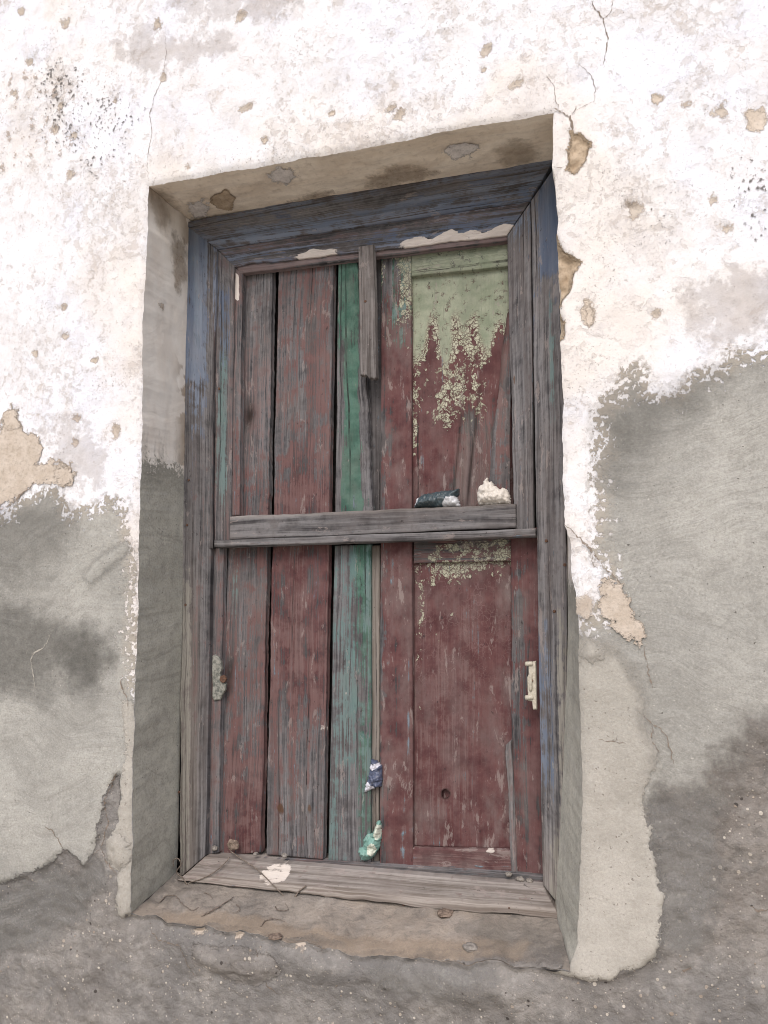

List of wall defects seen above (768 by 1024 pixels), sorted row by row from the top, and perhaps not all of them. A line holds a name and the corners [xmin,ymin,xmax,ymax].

crack [548,2,613,130]
flaking render [210,189,236,211]
spalling [564,130,593,175]
spalling [556,234,582,341]
spalling [0,347,768,1024]
crack [93,773,117,875]